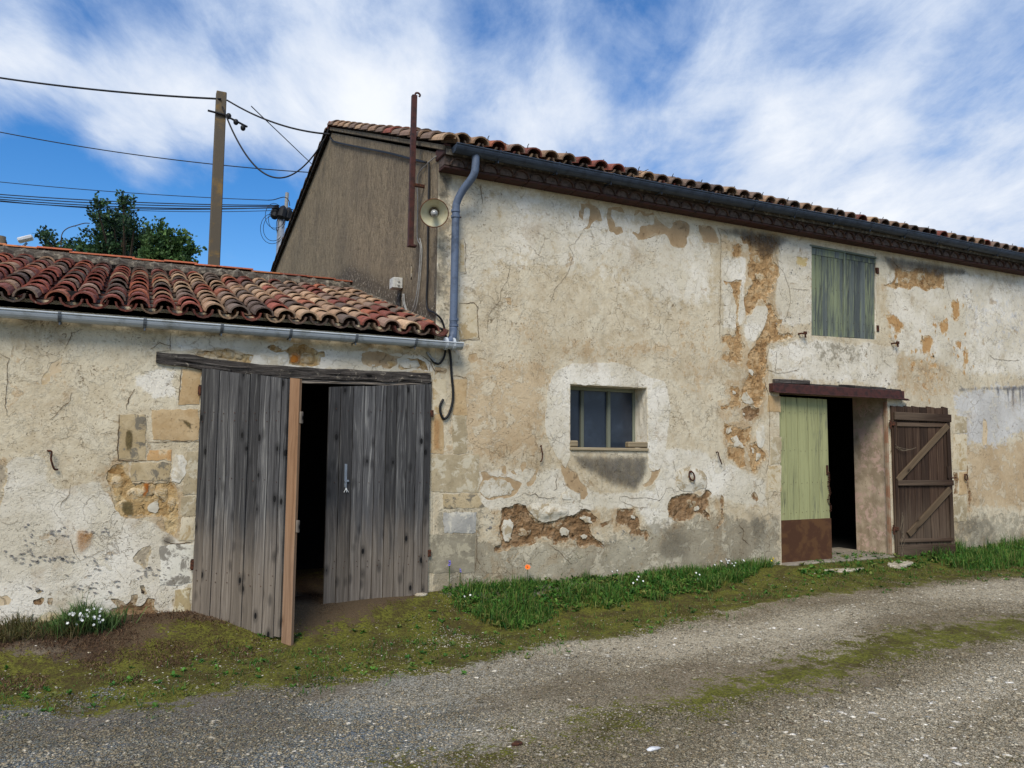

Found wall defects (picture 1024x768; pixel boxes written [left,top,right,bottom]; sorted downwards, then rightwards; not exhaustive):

flaking render [884,264,944,291]
flaking render [579,200,810,473]
peeling [905,298,974,404]
flaking render [106,462,179,537]
flaking render [479,462,649,553]
water stain [578,459,644,487]
flaking render [667,490,724,529]